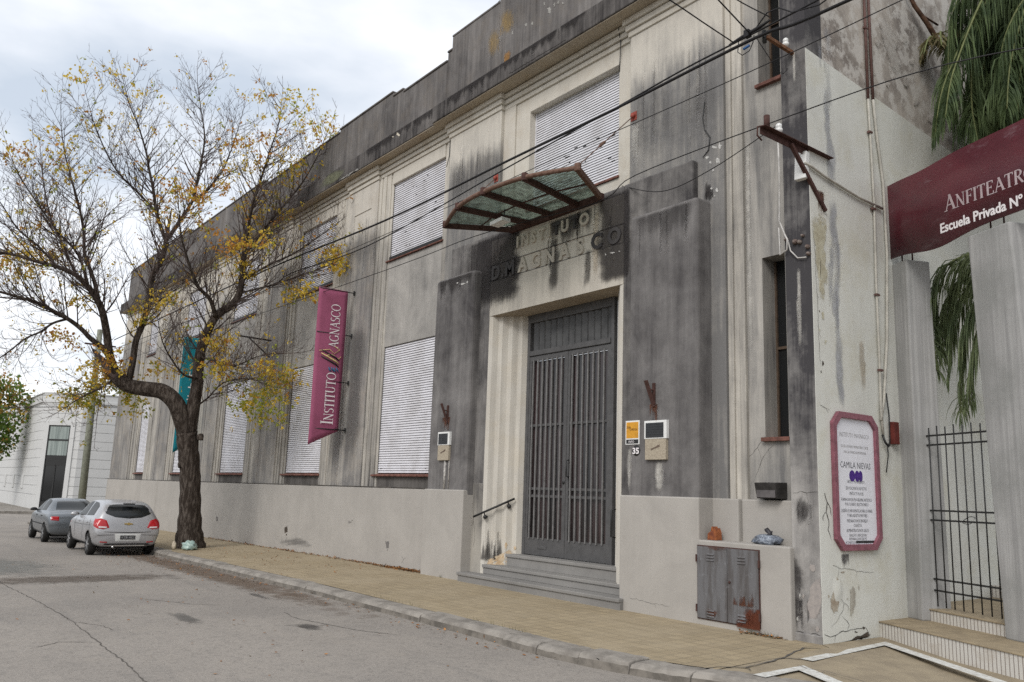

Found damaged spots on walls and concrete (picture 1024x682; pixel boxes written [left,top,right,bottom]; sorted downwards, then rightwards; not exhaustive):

water stain [447,12,583,103]
water stain [367,108,433,155]
water stain [836,345,844,398]
water stain [482,546,501,560]
rust [734,600,760,631]
crack [745,604,868,682]